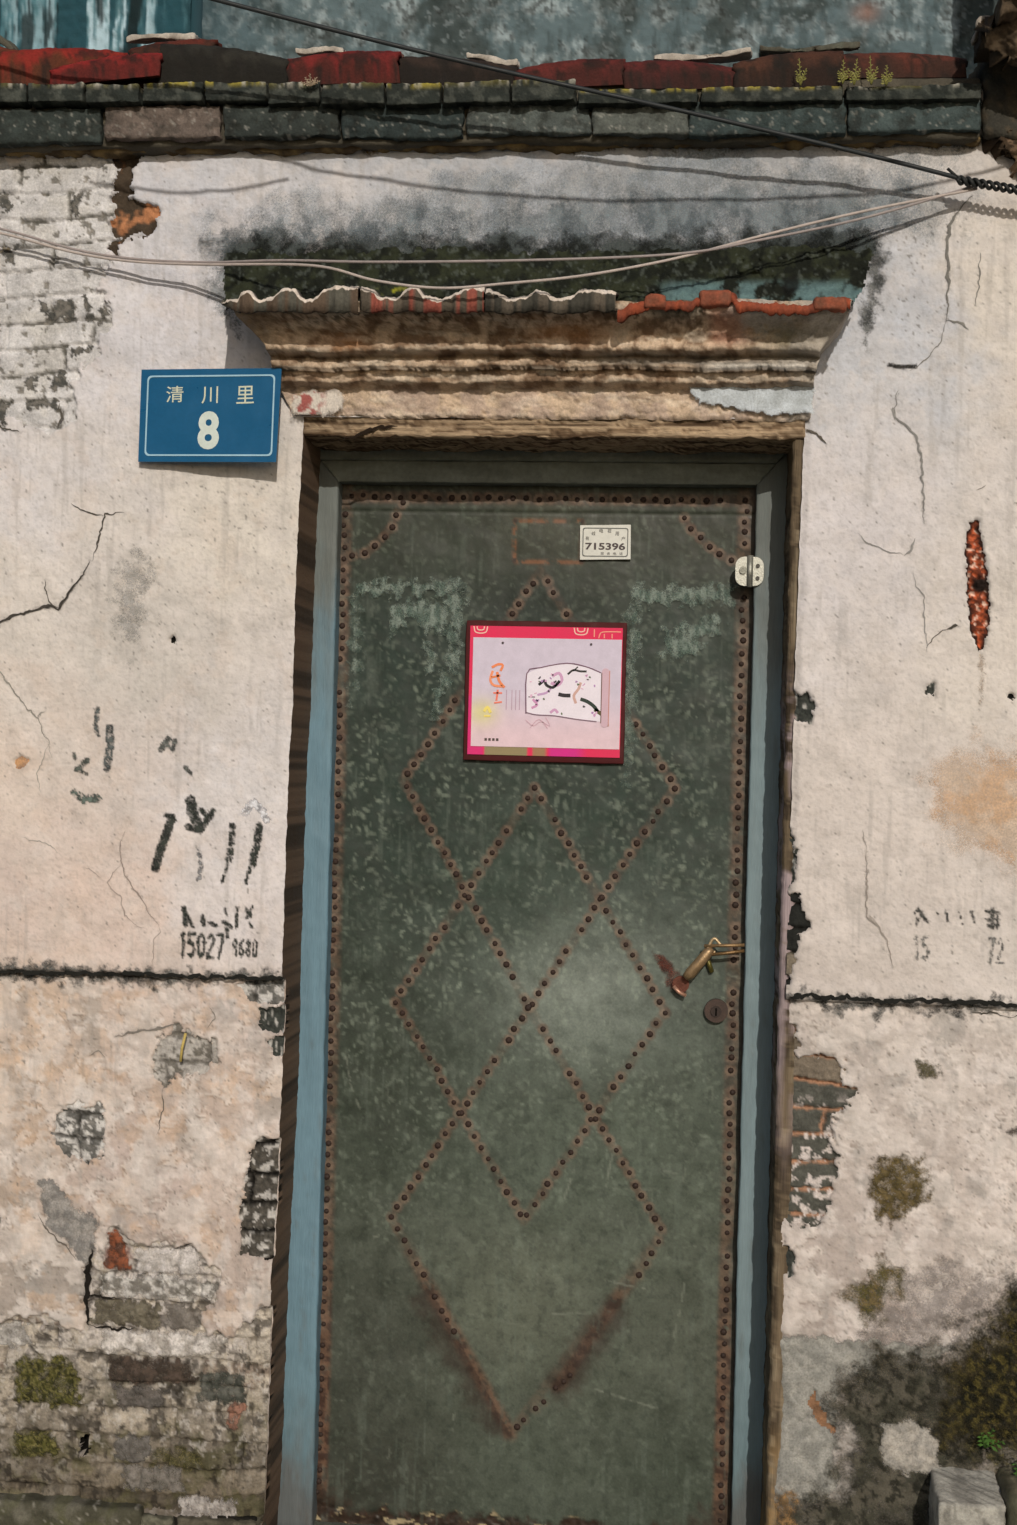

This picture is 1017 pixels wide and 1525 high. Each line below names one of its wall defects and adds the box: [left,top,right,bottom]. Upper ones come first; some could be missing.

flaking render [0,156,161,435]
damp [198,147,938,345]
crack [861,196,981,646]
crack [0,504,124,623]
spalling [964,520,991,701]
crack [0,672,52,792]
crack [786,832,1017,1021]
flaking render [51,1099,106,1165]
peeling [239,1136,280,1260]
flaking render [785,1024,859,1229]
flaking render [0,1179,273,1523]
damp [776,1257,1000,1525]